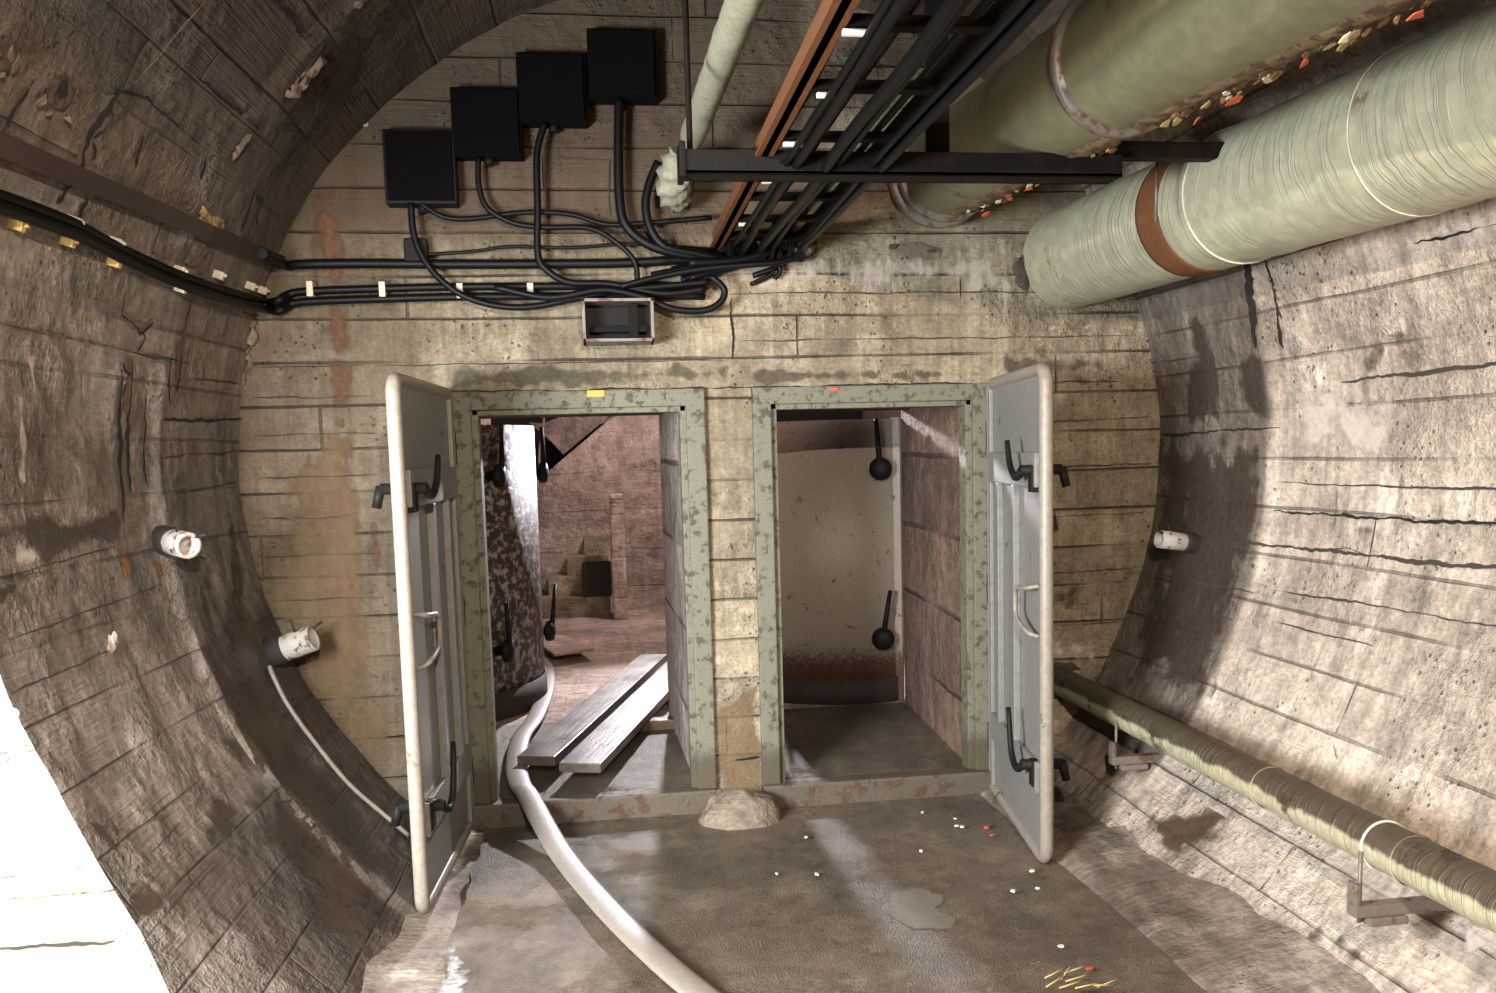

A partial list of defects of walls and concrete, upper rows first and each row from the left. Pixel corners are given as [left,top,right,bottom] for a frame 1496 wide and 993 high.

crack [56,0,334,232]
rust [311,193,343,283]
crack [1415,224,1496,244]
crack [1243,260,1283,350]
rust [329,304,351,403]
crack [1342,362,1496,383]
crack [1053,380,1279,468]
leakage [0,511,121,569]
crack [1221,481,1496,569]
leakage [0,584,15,603]
crack [1053,567,1496,646]